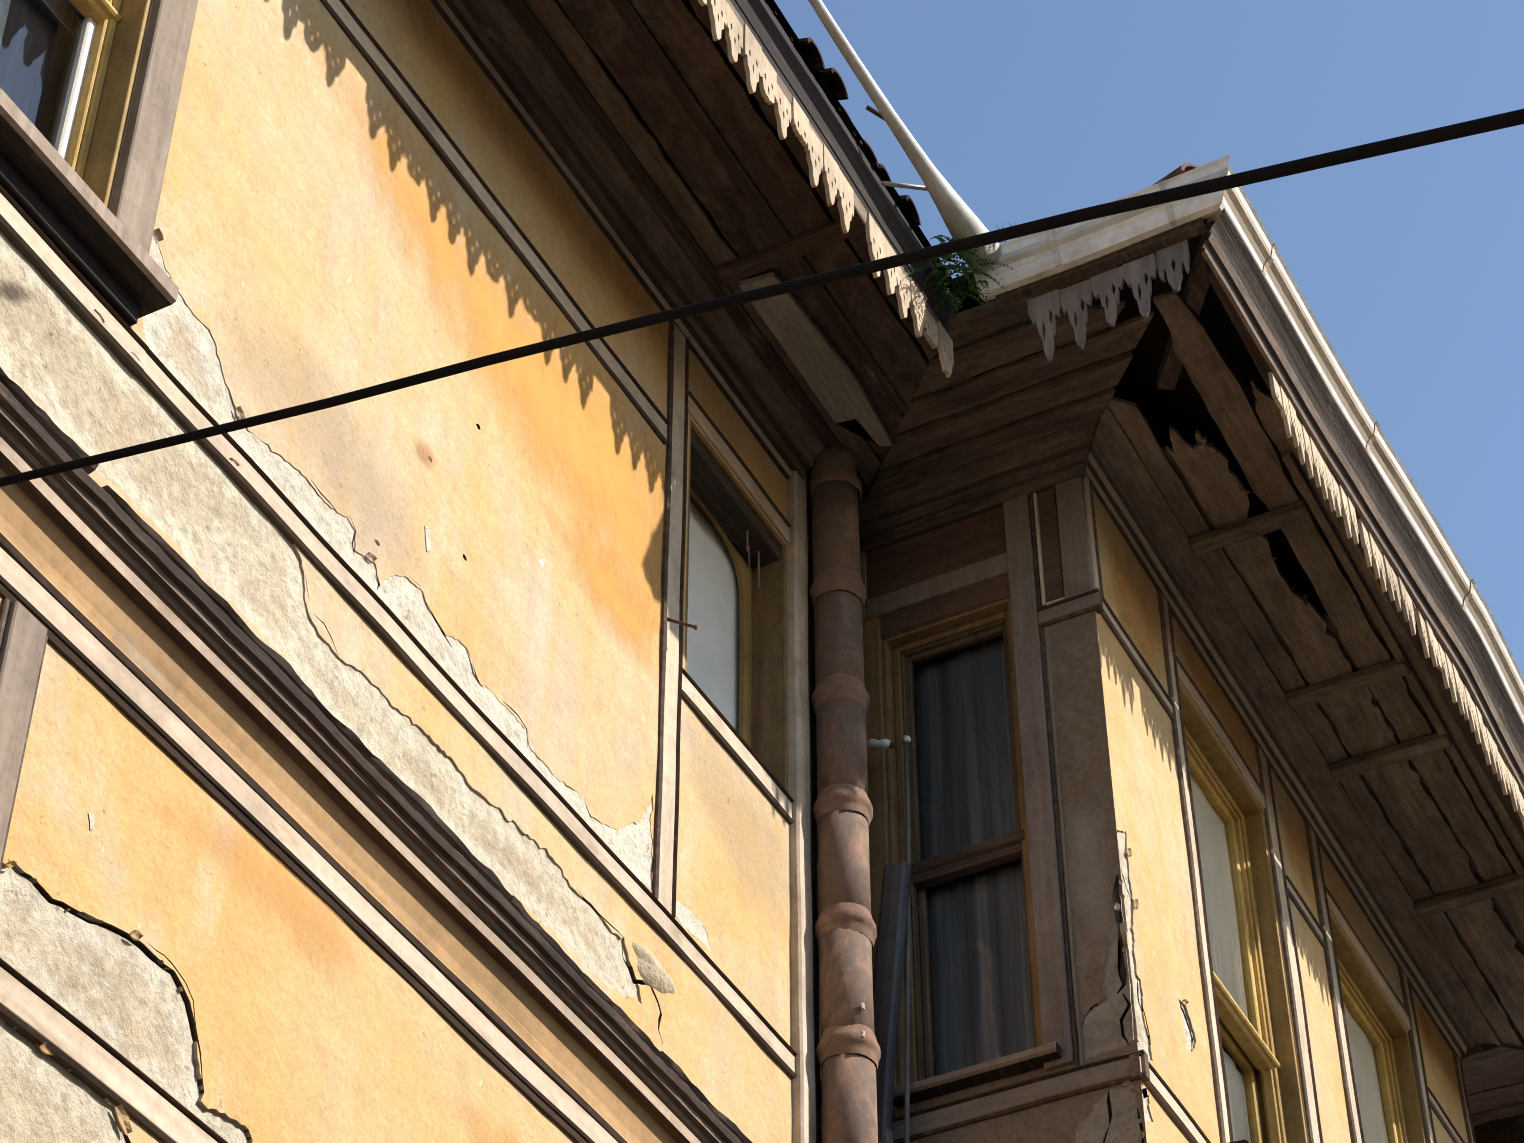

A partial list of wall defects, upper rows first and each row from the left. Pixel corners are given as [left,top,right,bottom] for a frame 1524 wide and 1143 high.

flaking render [0,228,653,1001]
flaking render [0,860,248,1143]
peeling [1075,1080,1152,1143]
crack [1115,886,1131,1044]